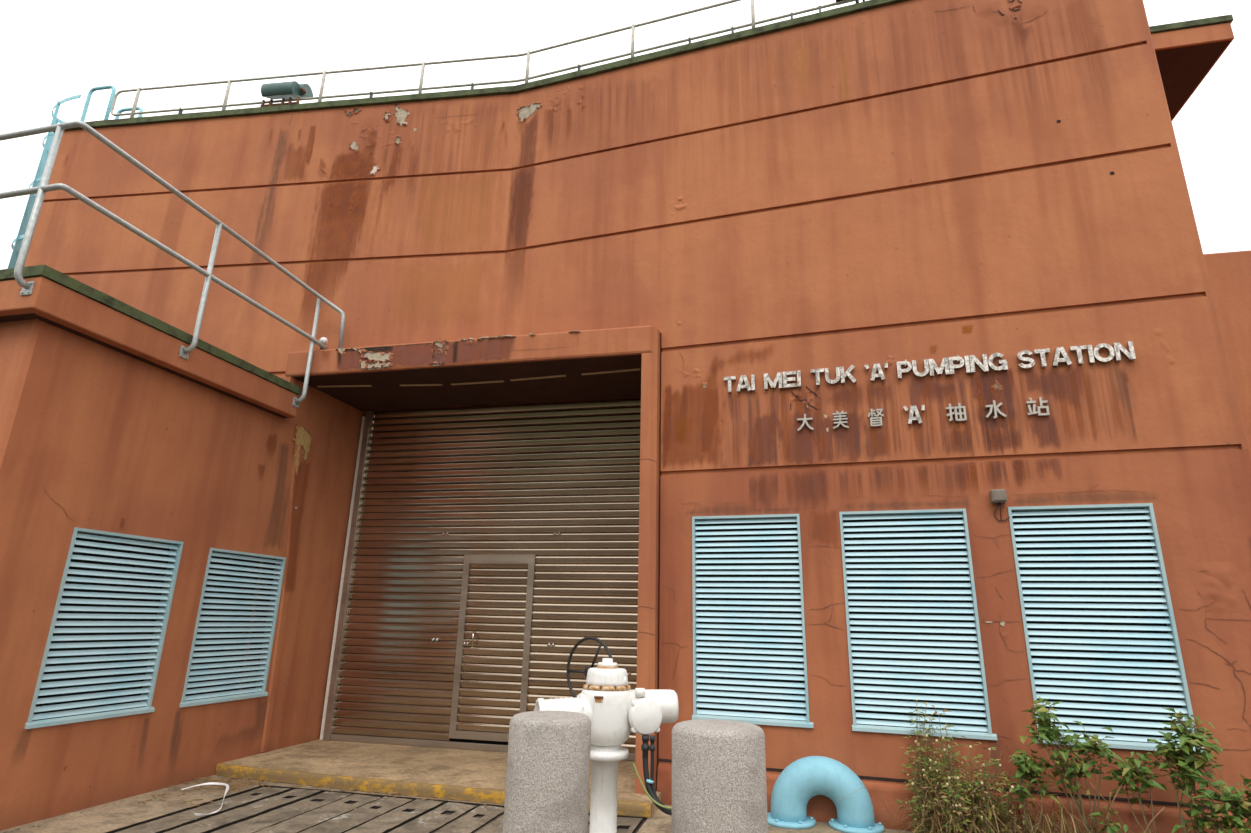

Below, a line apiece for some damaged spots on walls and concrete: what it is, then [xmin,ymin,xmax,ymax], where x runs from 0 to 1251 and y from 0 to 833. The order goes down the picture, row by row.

peeling [383,103,417,147]
peeling [516,102,544,123]
water stain [512,115,536,236]
peeling [336,348,393,370]
peeling [428,333,536,366]
peeling [293,423,312,476]
water stain [749,385,887,464]
water stain [911,371,1095,478]
crack [1182,569,1251,751]